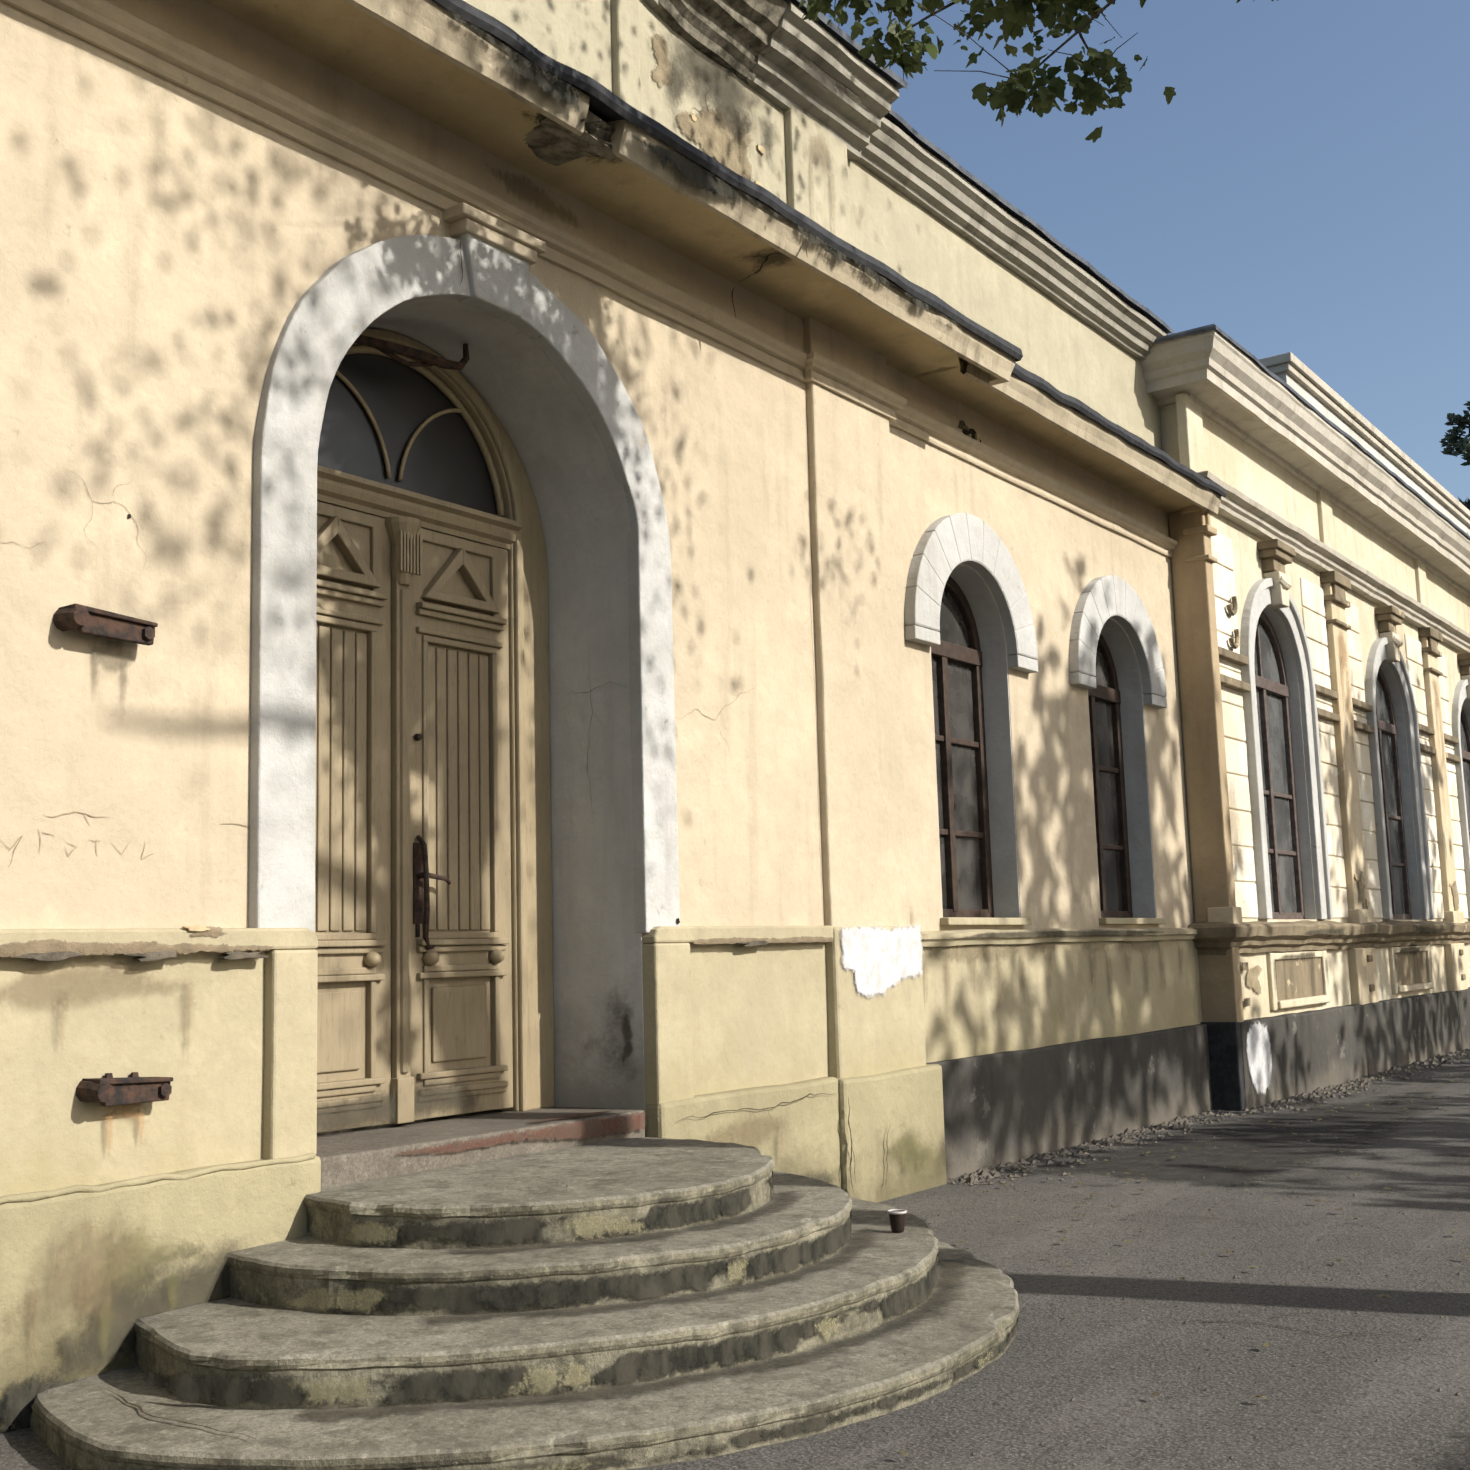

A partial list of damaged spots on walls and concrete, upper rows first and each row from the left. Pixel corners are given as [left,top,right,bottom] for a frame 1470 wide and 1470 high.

spalling [652,33,672,87]
damp [670,42,773,157]
spalling [676,104,765,186]
peeling [9,951,83,961]
peeling [119,951,178,962]
spalling [182,925,269,960]
damp [608,1002,632,1067]
crack [677,1093,891,1195]
damp [0,1336,73,1432]